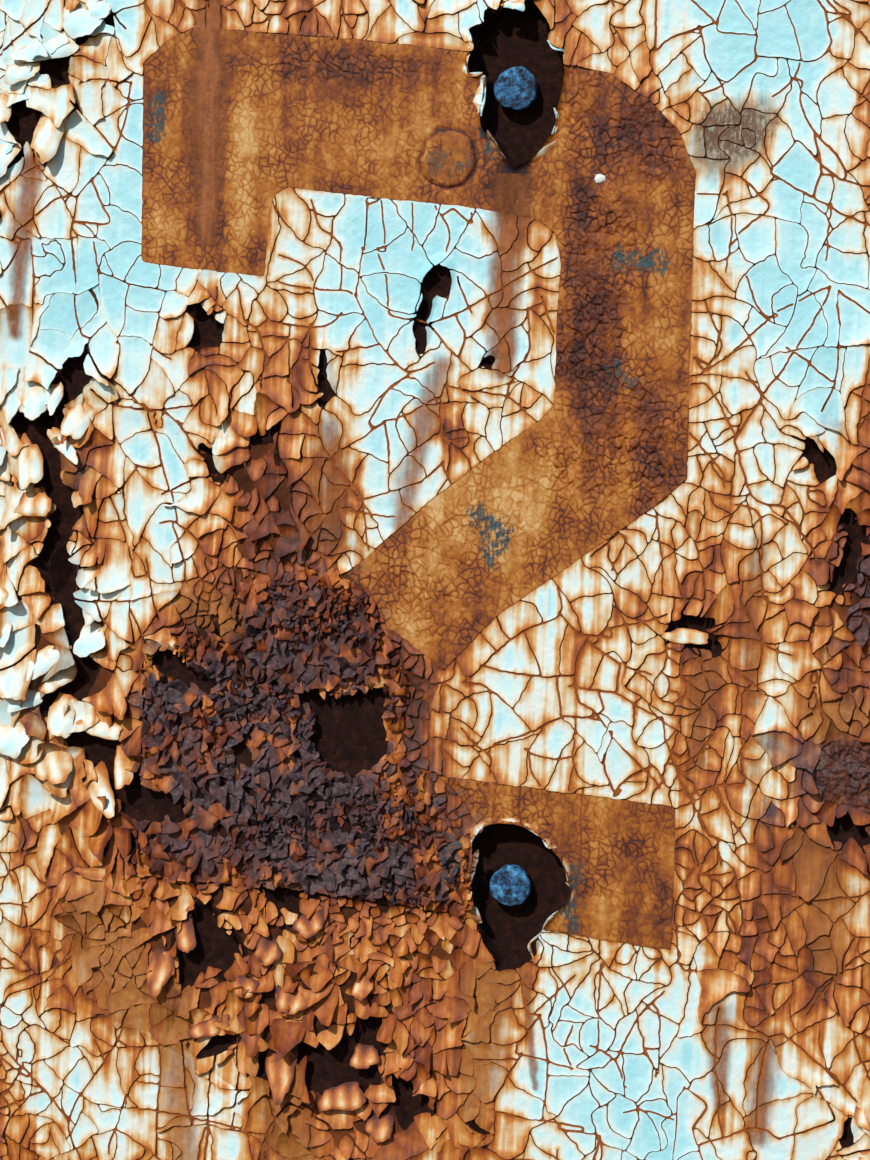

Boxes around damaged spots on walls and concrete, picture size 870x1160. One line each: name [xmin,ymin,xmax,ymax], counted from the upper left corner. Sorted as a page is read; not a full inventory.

crack [0,0,147,94]
peeling [0,0,151,200]
spalling [208,0,565,167]
crack [0,56,558,769]
crack [420,0,870,1160]
peeling [0,281,570,1160]
peeling [674,399,870,1046]
corrosion [74,885,157,1030]
corrosion [164,981,196,1160]
crack [0,805,665,1160]
corrosion [711,1003,729,1111]
corrosion [750,1032,773,1144]